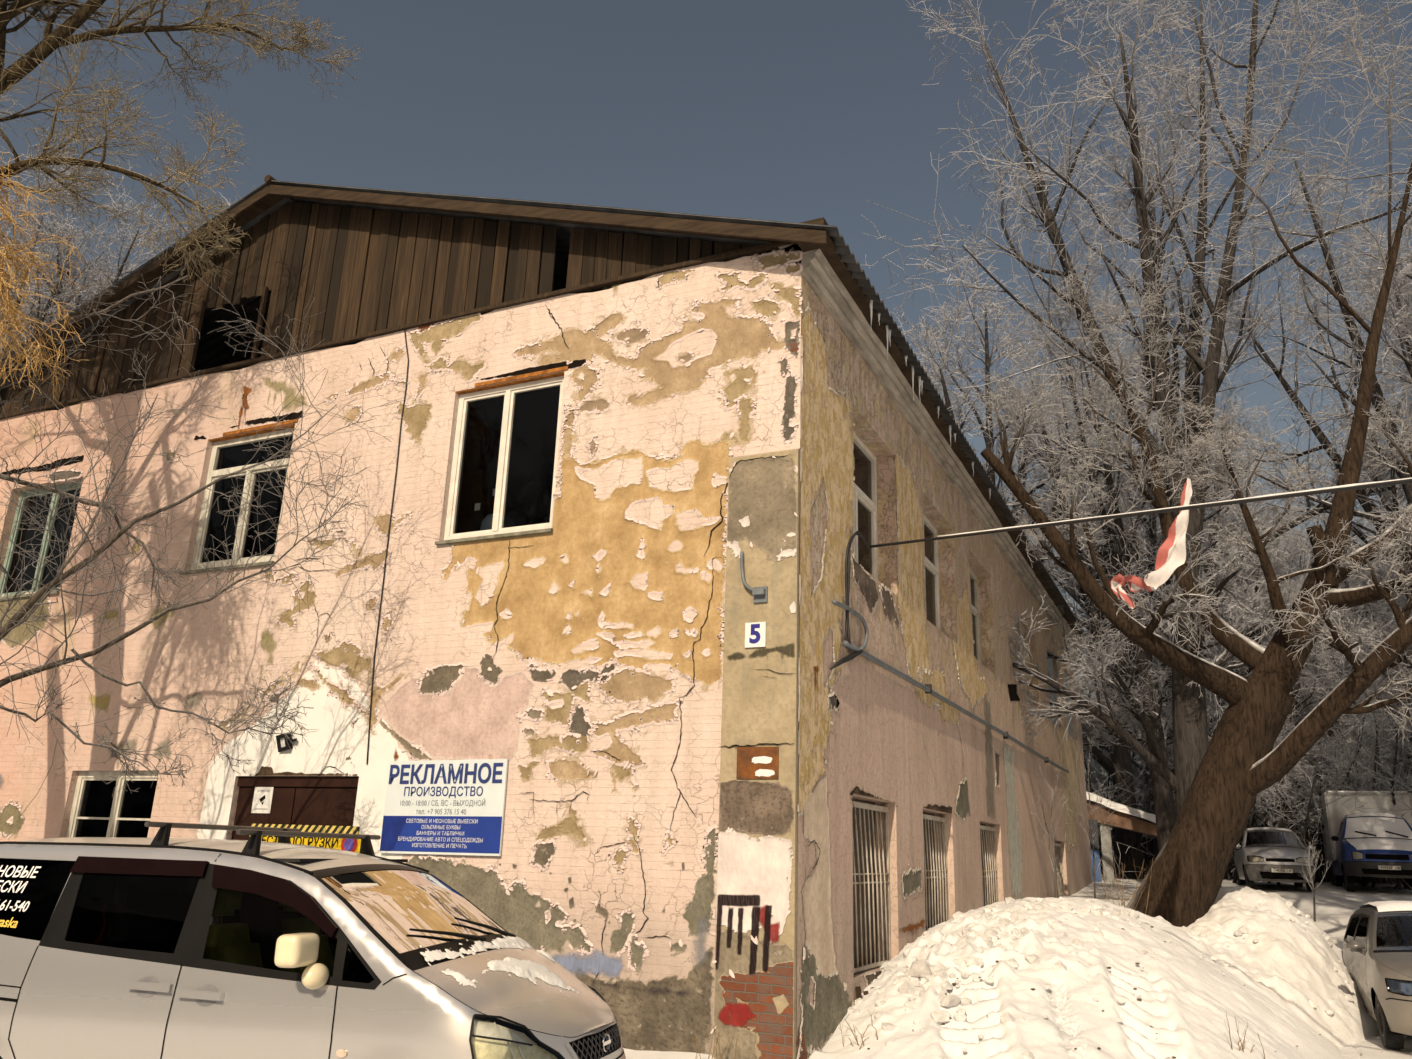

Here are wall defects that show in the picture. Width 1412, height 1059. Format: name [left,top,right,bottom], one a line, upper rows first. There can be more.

peeling [217,250,989,821]
crack [593,454,794,983]
flaking render [1008,684,1020,701]
peeling [0,799,26,839]
flaking render [406,804,650,975]
flaking render [607,815,854,1059]
flaking render [864,967,885,986]